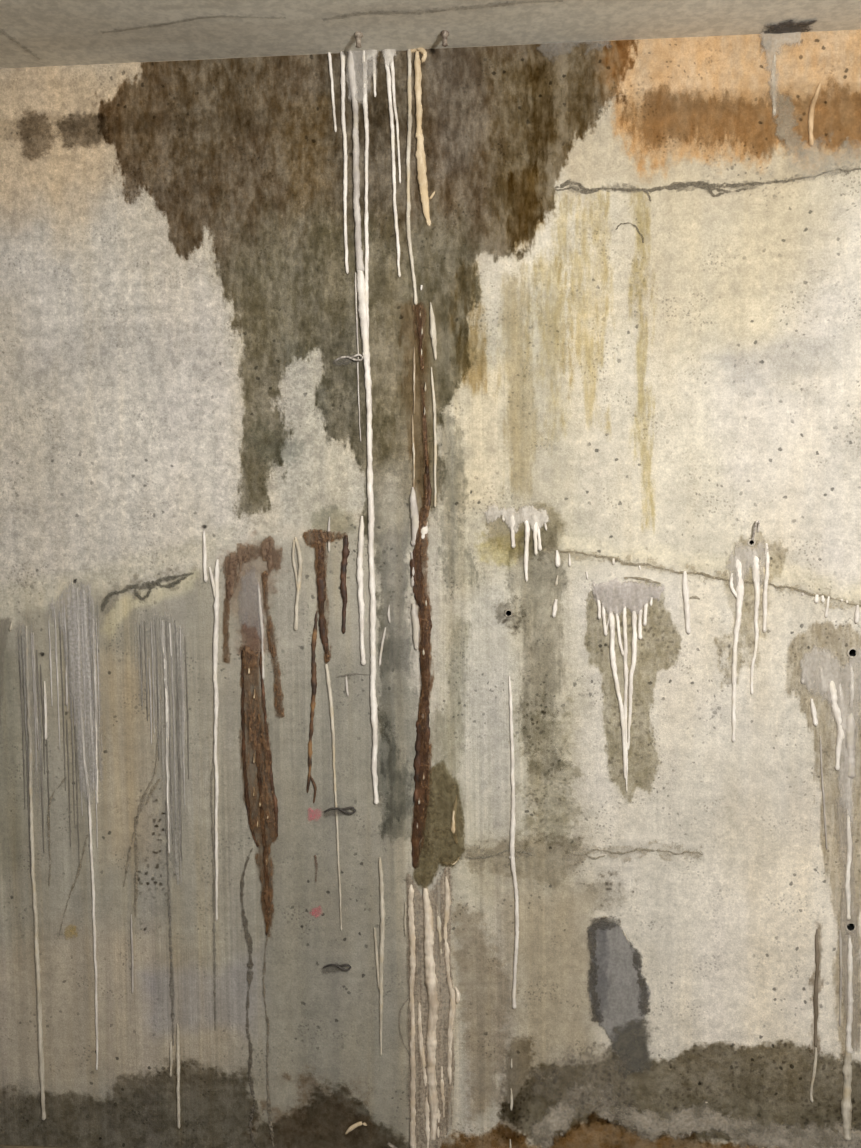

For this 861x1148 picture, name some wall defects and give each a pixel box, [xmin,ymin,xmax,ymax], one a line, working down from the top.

crack [555,168,861,201]
damp [58,40,637,805]
damp [0,581,103,1143]
corrosion [223,536,284,937]
corrosion [303,529,350,803]
corrosion [410,302,434,869]
damp [397,866,460,1148]
corrosion [440,1125,532,1148]
spalling [575,916,651,1106]
damp [586,558,664,792]
damp [502,646,861,1148]
crack [550,549,861,609]